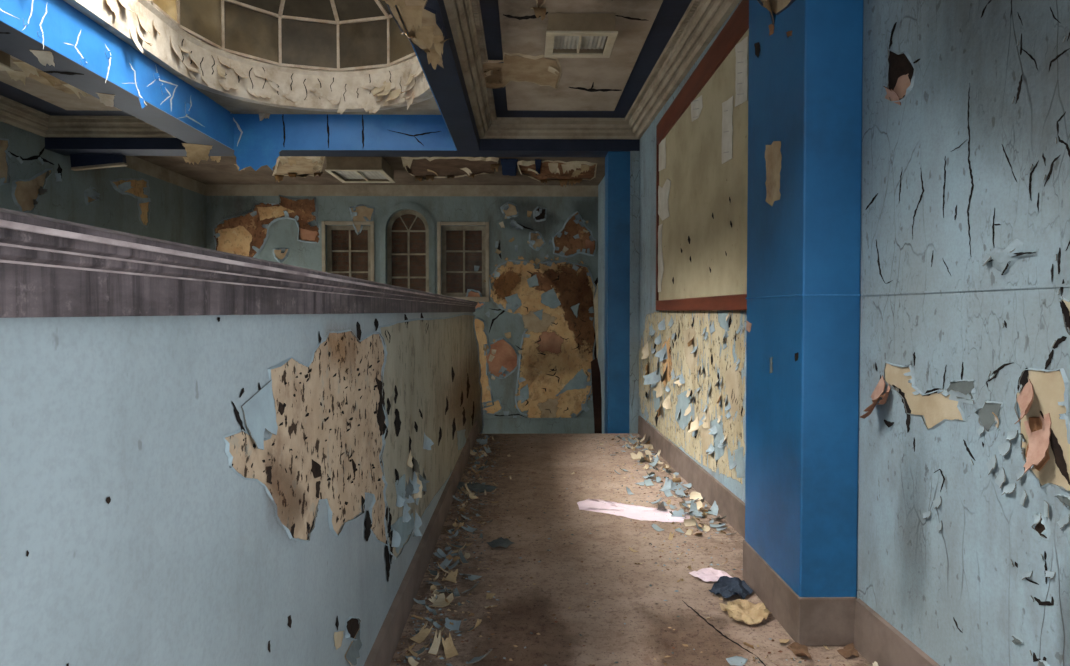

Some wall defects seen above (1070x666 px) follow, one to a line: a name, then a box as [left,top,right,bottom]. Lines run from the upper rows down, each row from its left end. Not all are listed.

crack [0,0,205,127]
peeling [106,0,450,115]
crack [981,0,1070,104]
peeling [213,195,320,263]
peeling [234,150,325,182]
crack [876,240,893,284]
crack [866,83,1001,275]
crack [1002,111,1070,211]
crack [1051,241,1070,296]
peeling [223,202,598,582]
peeling [639,310,752,484]
peeling [860,361,1070,540]